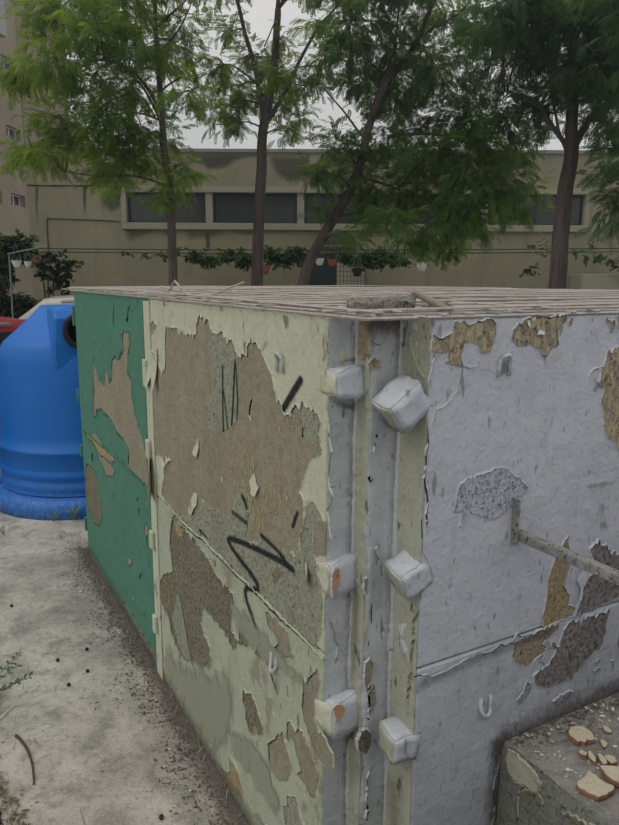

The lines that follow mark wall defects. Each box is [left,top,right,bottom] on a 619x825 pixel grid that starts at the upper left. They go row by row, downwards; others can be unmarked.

peeling [429,317,497,367]
peeling [510,314,573,357]
peeling [597,314,619,455]
peeling [83,429,115,527]
peeling [92,314,340,670]
peeling [588,538,619,570]
peeling [511,557,619,707]
peeling [218,756,244,803]
peeling [242,668,334,798]
peeling [283,794,306,825]